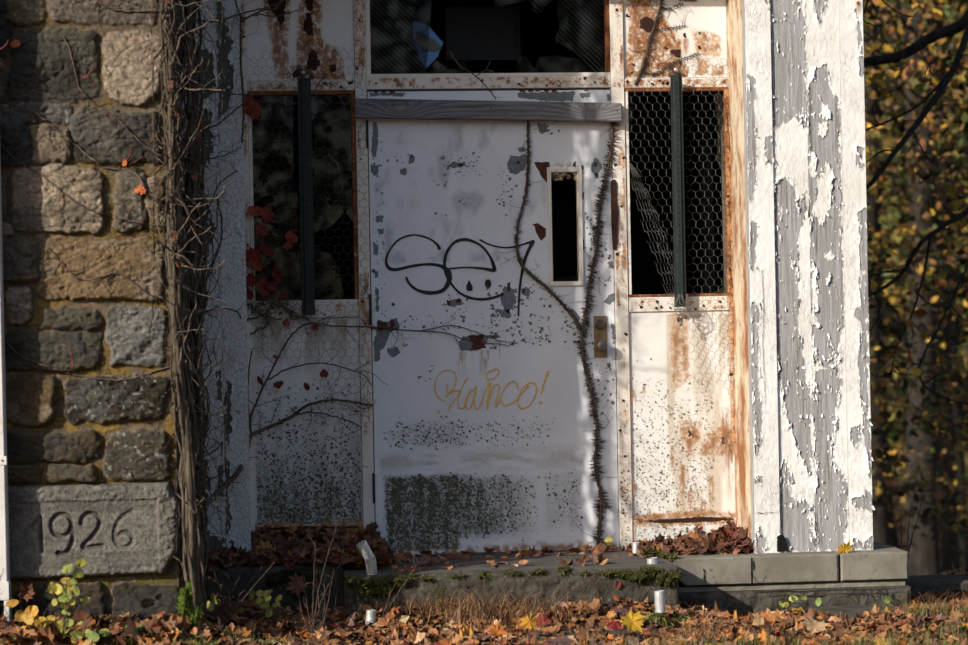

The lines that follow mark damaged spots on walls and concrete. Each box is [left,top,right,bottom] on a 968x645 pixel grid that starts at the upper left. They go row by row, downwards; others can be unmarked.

peeling [197,0,235,165]
corrosion [249,0,365,90]
peeling [371,121,616,417]
corrosion [474,0,736,471]
peeling [745,0,875,553]
peeling [201,370,234,551]
corrosion [621,450,736,537]